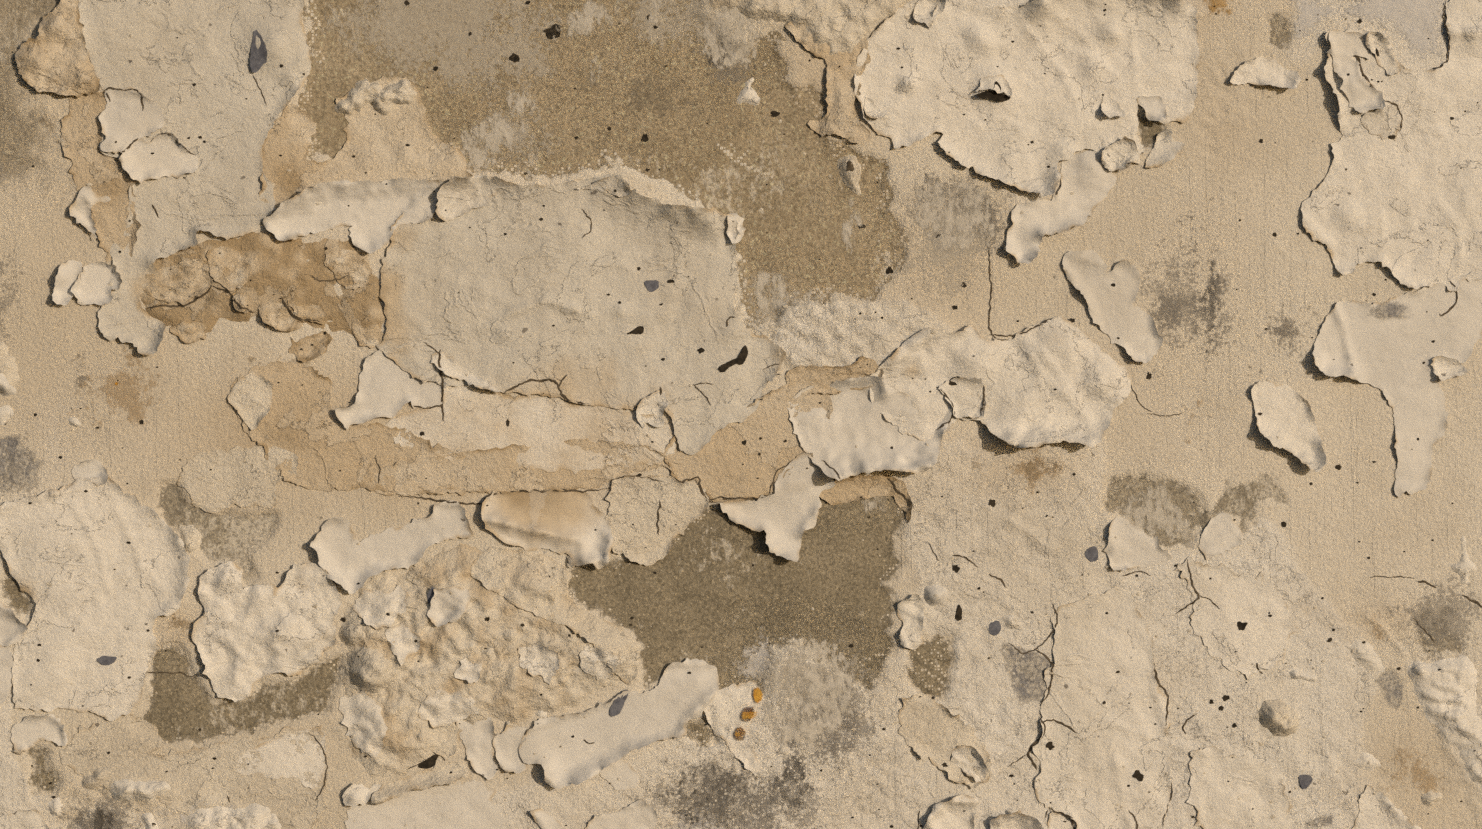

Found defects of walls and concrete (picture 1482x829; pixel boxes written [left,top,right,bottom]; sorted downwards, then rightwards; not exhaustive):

spalling [0,0,1202,355]
peeling [1062,249,1163,379]
peeling [1300,0,1482,498]
peeling [1251,381,1341,472]
peeling [0,174,1131,829]
crack [1176,559,1220,614]
crack [1008,605,1077,770]
crack [1154,663,1197,734]
crack [1045,807,1075,829]
crack [1129,783,1173,829]